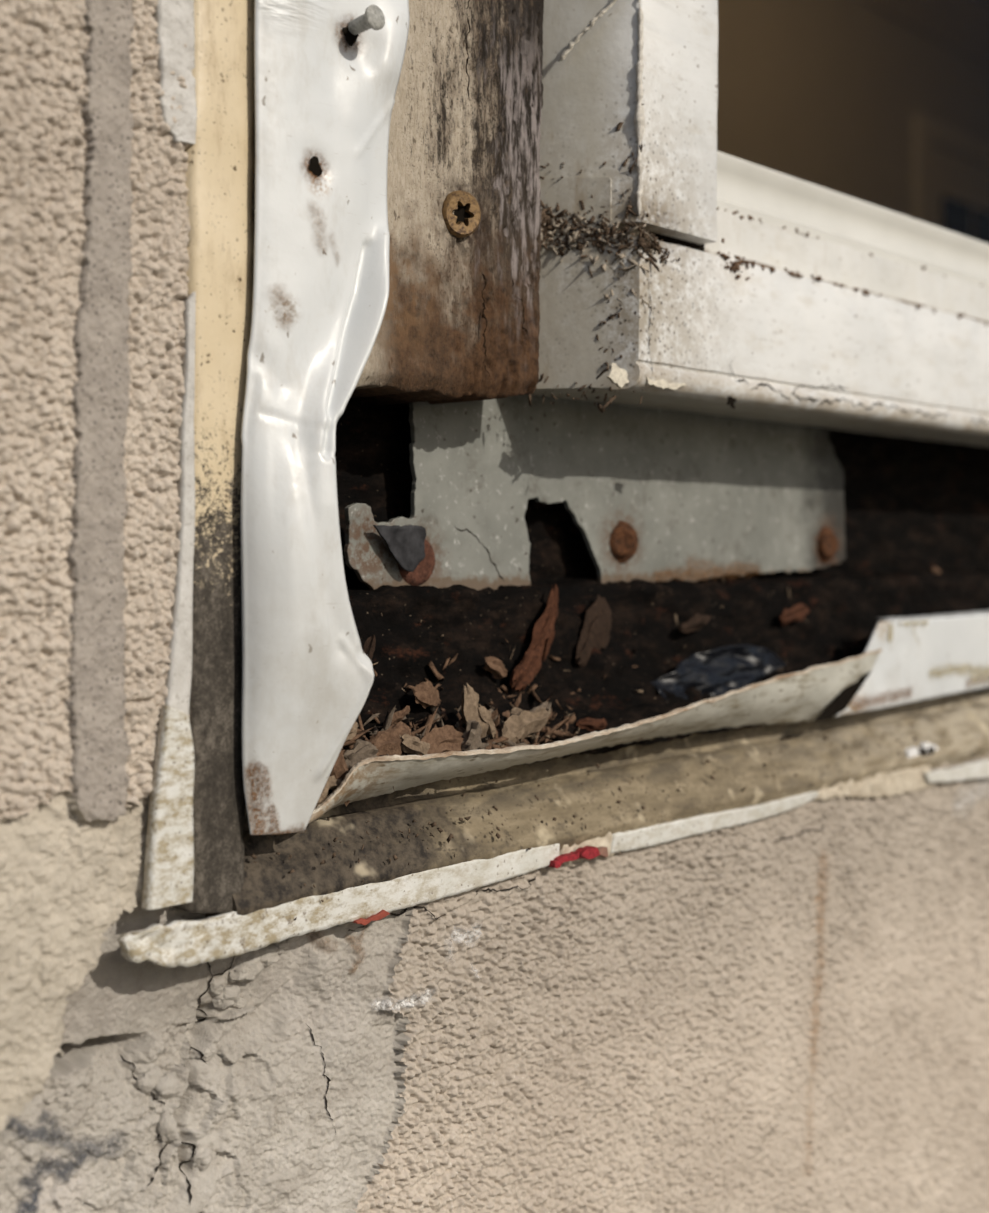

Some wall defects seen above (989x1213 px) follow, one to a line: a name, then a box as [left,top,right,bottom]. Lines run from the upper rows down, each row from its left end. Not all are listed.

crack [120,1054,196,1206]
spalling [0,790,413,1213]
crack [189,956,235,1064]
crack [306,1024,336,1132]